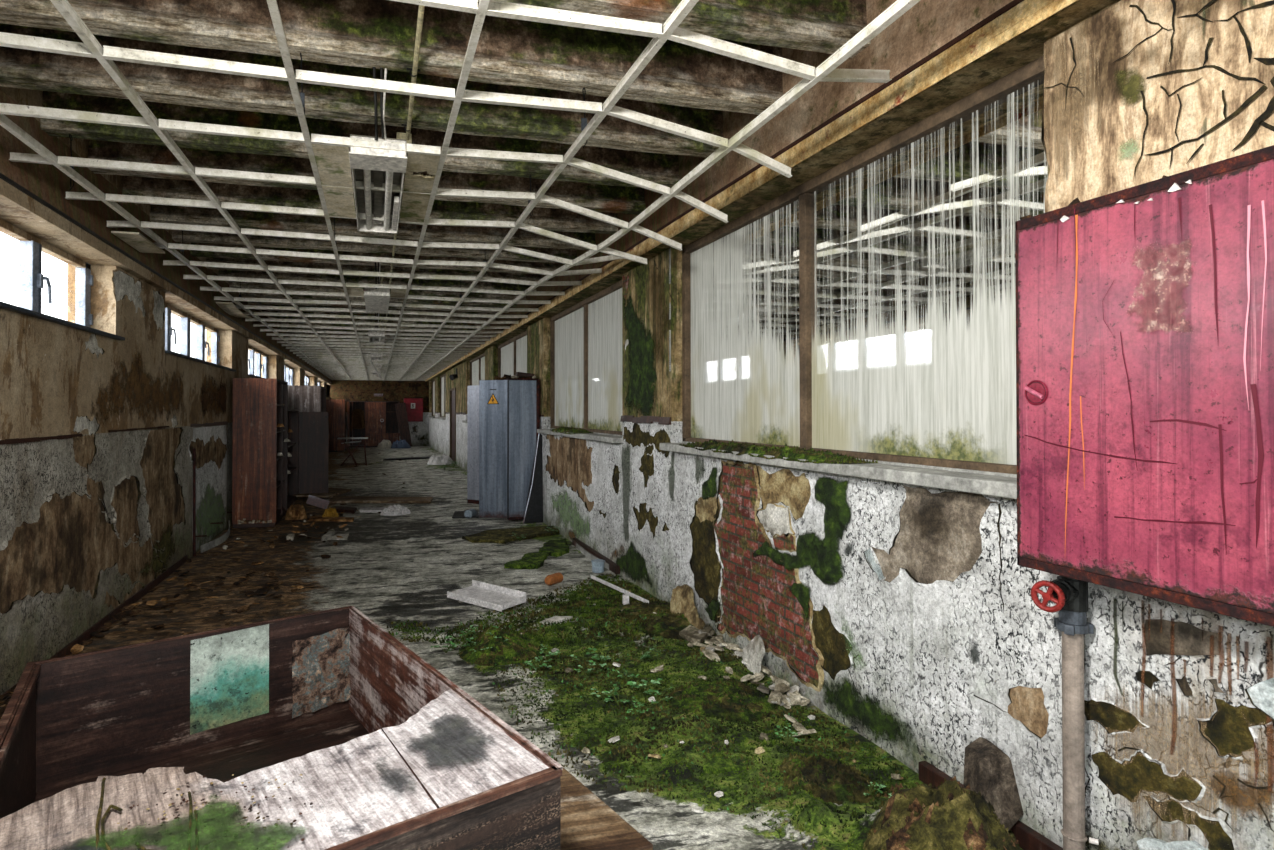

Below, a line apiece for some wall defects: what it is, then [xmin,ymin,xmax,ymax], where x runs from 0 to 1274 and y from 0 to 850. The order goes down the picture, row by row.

crack [1044,37,1084,111]
crack [1108,0,1274,180]
peeling [0,414,227,618]
peeling [543,434,607,519]
peeling [612,463,622,496]
peeling [623,423,671,542]
flaking render [689,460,853,692]
peeling [864,483,1004,588]
rust [1141,600,1186,755]
rust [1202,618,1248,695]
rust [1253,715,1274,792]